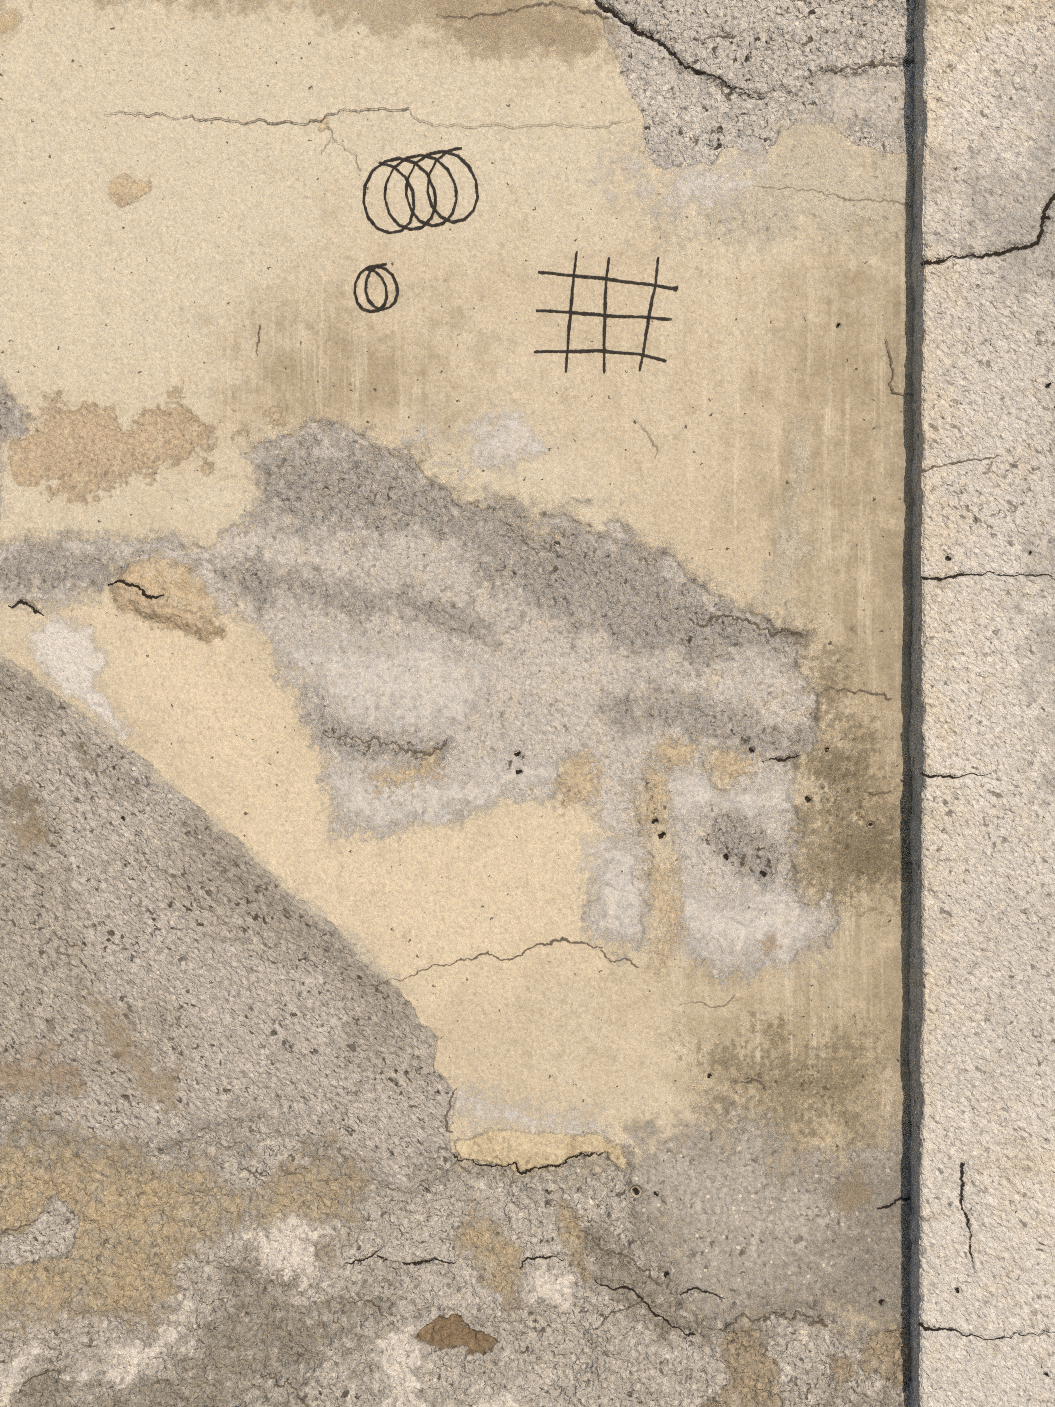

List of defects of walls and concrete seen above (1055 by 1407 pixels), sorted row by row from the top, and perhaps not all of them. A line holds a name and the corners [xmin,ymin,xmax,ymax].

spalling [588,0,916,235]
crack [920,194,1055,266]
crack [922,571,1055,581]
peeling [0,379,844,984]
damp [361,748,444,803]
damp [551,749,604,816]
damp [635,733,701,833]
damp [810,697,893,880]
crack [358,937,639,986]
crack [960,1163,975,1269]
crack [918,1322,1055,1340]